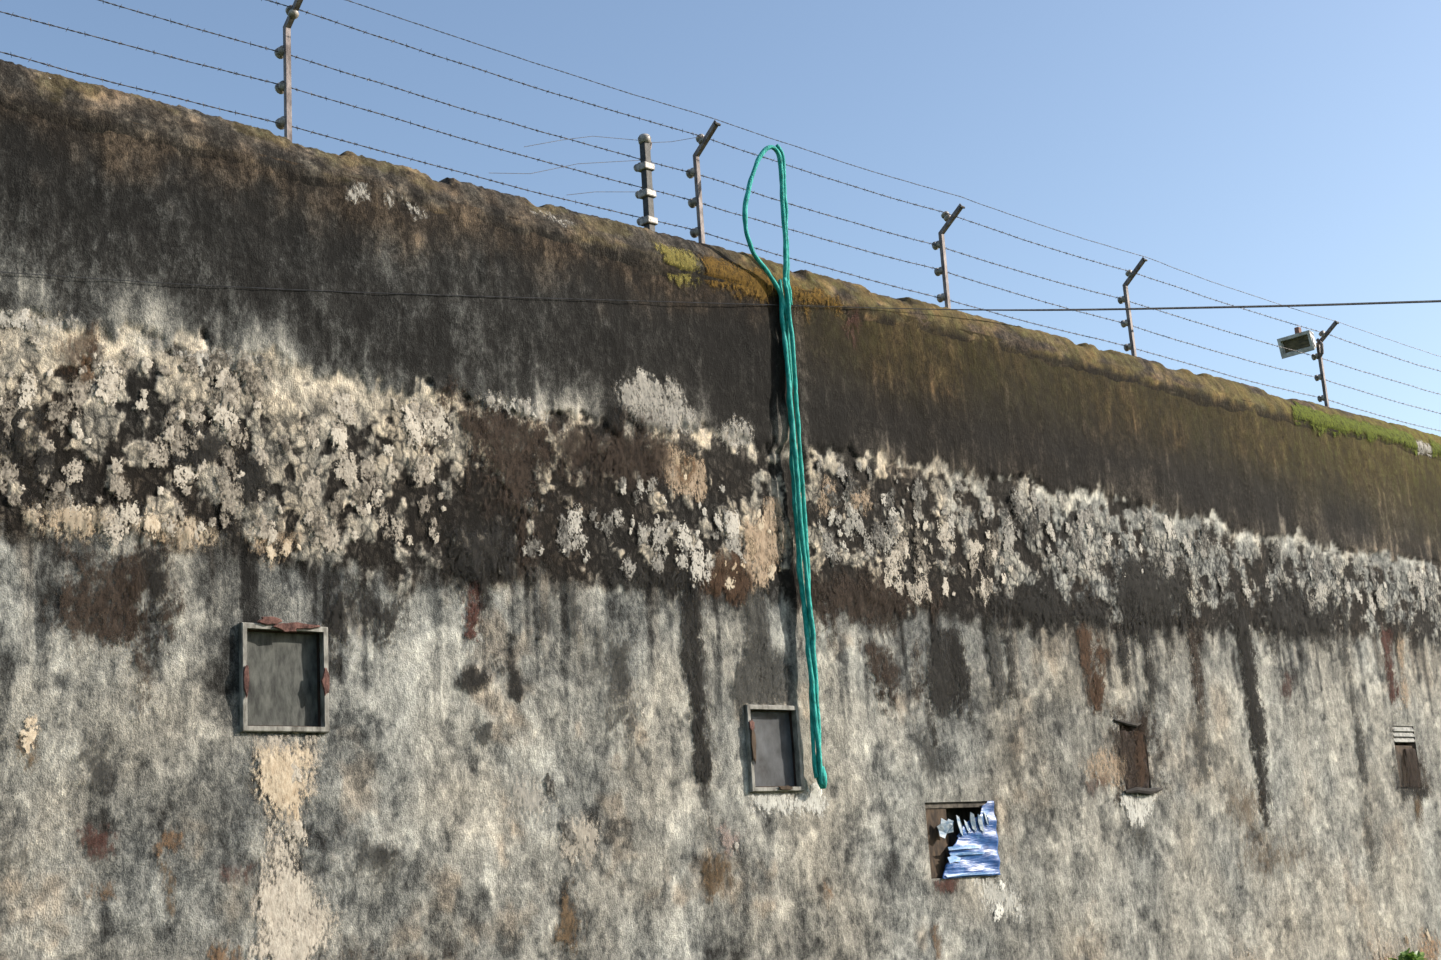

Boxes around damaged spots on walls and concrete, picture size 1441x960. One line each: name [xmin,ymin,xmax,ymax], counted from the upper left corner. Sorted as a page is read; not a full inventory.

damp [0,403,56,488]
damp [168,428,226,479]
damp [436,375,675,640]
rust [257,617,320,632]
rust [321,668,330,695]
damp [455,632,524,703]
damp [608,562,716,828]
damp [805,568,975,785]
rust [1076,623,1113,715]
damp [985,551,1211,807]
damp [1229,573,1383,871]
flaking render [248,735,341,960]